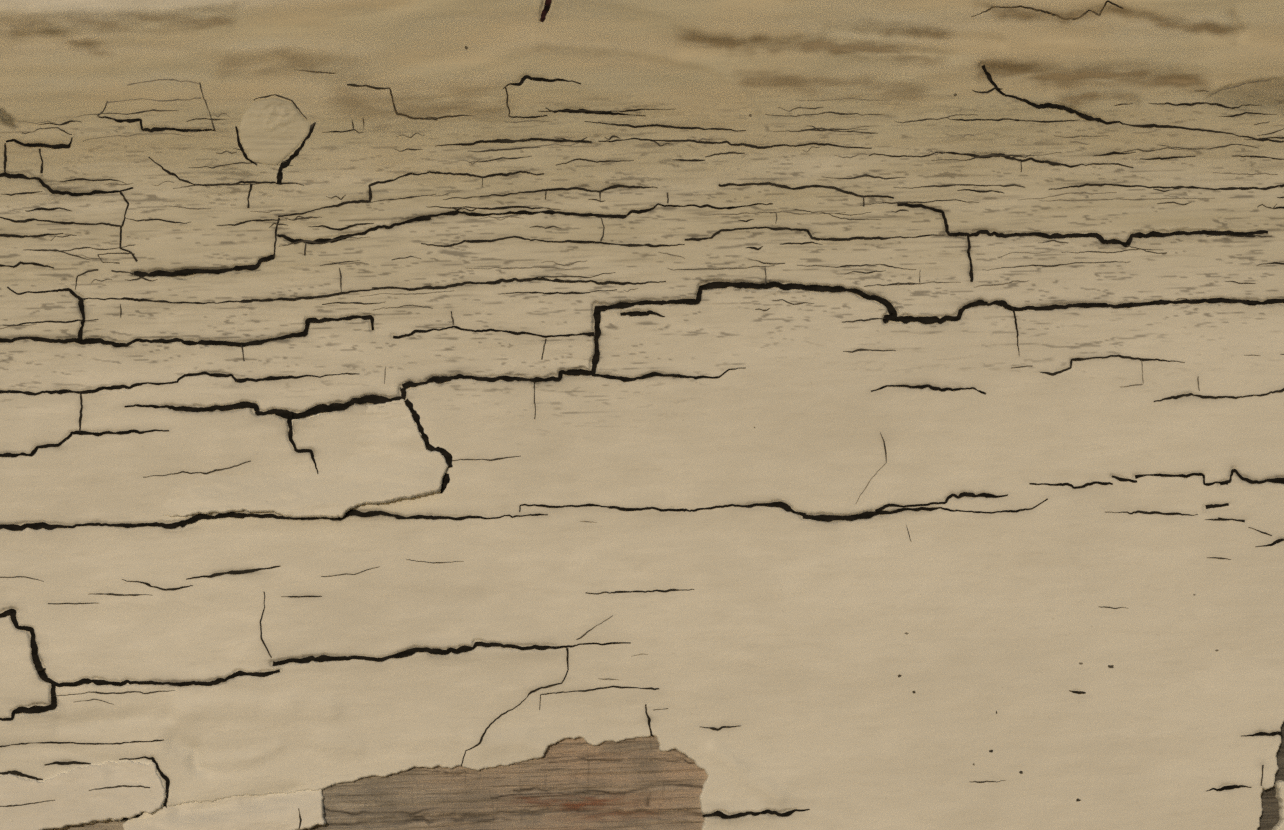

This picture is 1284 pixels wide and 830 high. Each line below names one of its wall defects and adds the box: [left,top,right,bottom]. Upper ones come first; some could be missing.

crack [540,0,552,22]
crack [0,65,1284,474]
crack [0,432,1284,560]
crack [703,724,737,732]
peeling [0,736,708,830]
crack [702,809,810,819]
crack [1207,722,1284,830]